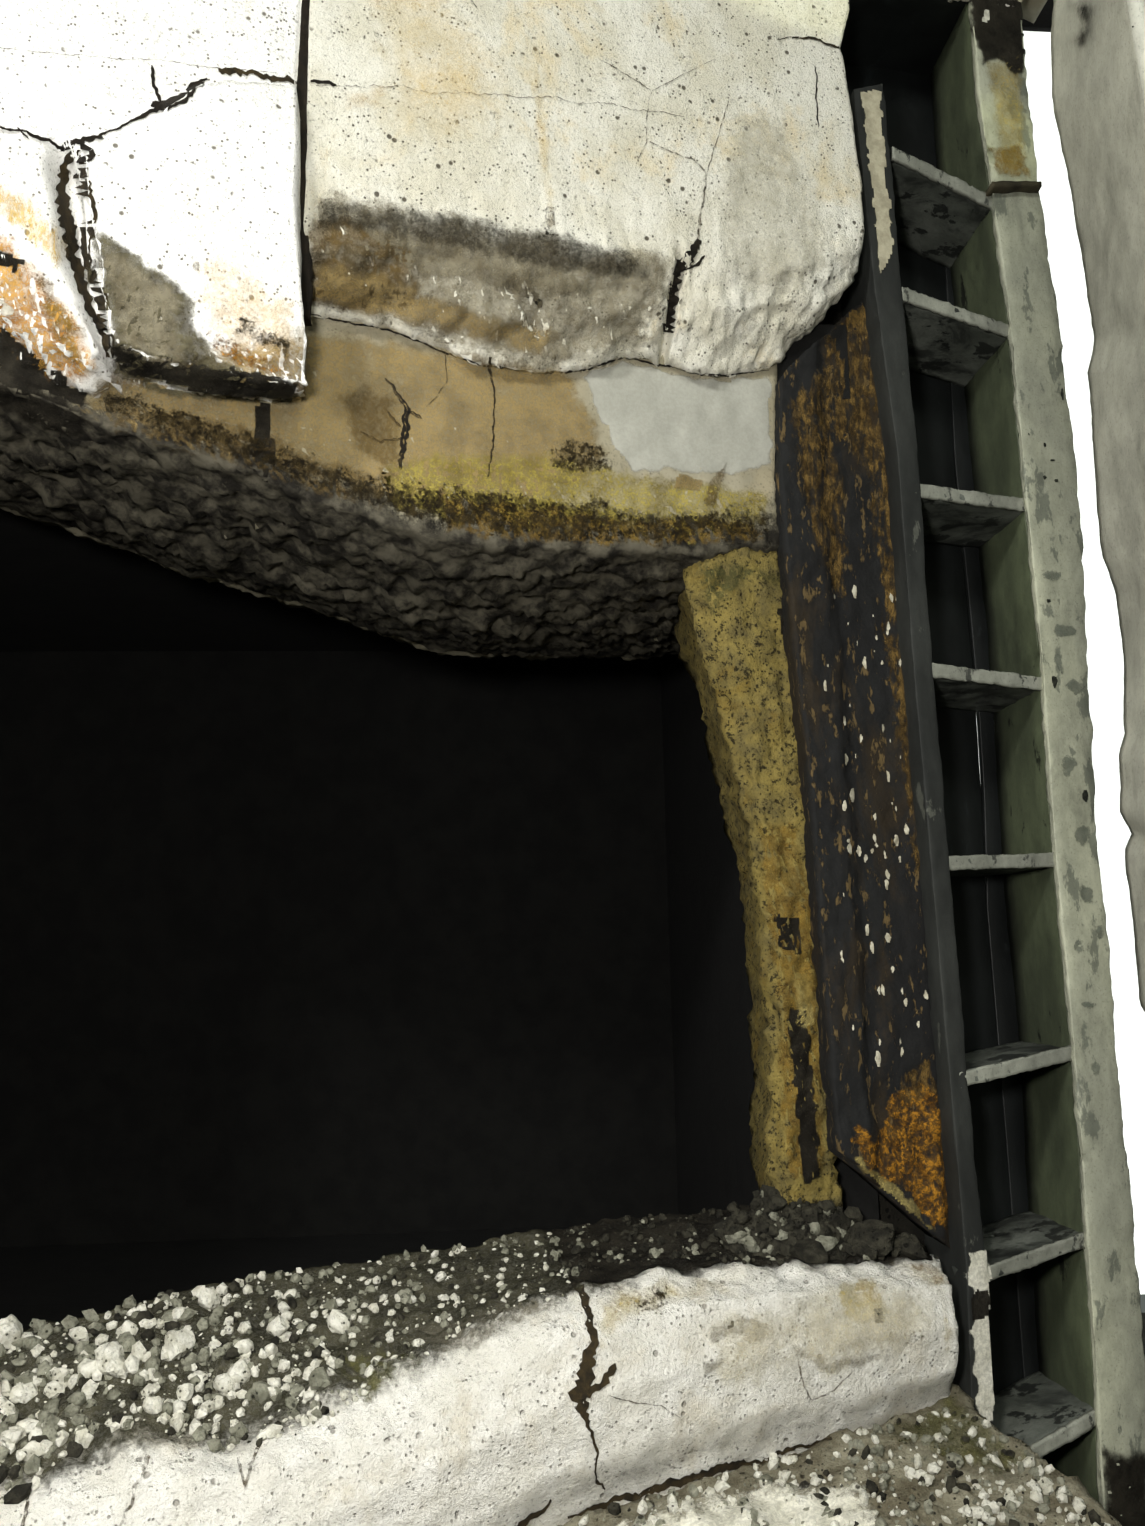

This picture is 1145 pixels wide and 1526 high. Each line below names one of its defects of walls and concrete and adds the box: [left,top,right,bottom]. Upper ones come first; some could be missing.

rust [991,67,1030,176]
rust [0,193,94,407]
crack [0,0,767,477]
flaking render [674,469,724,504]
rust [791,305,913,813]
rust [763,826,823,1184]
rust [851,1059,948,1227]
crack [517,1276,832,1526]
crack [798,1364,849,1400]